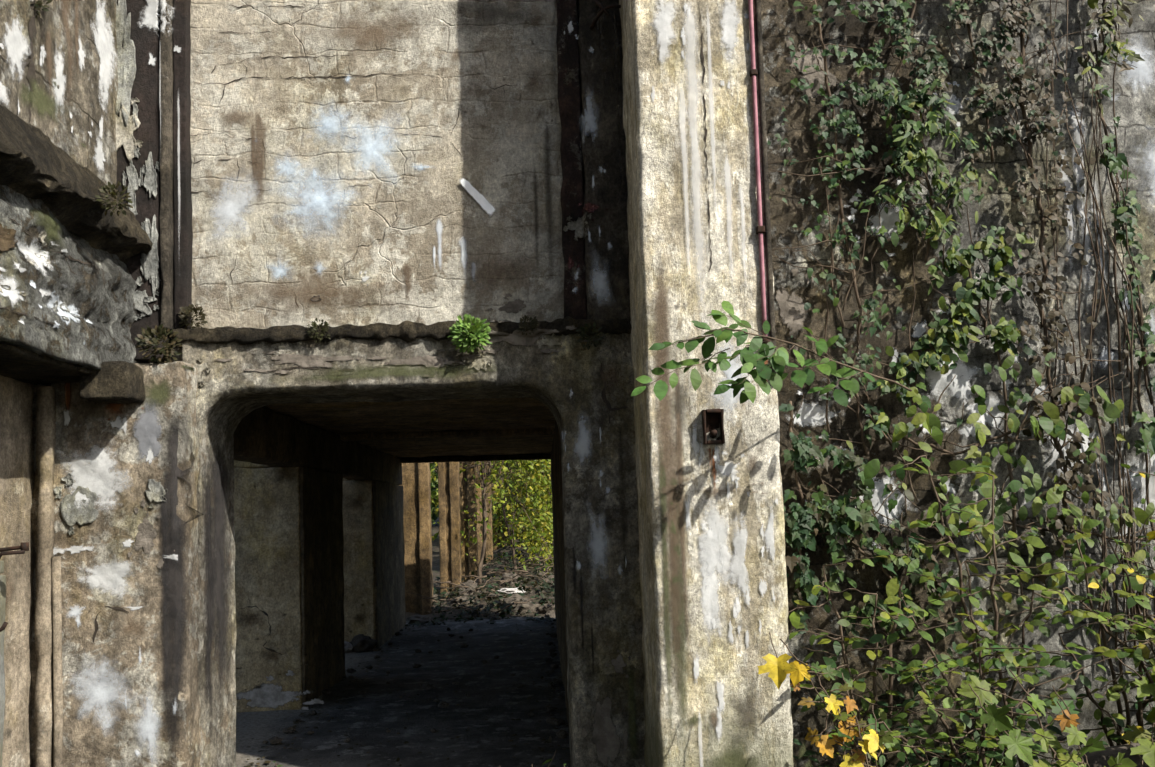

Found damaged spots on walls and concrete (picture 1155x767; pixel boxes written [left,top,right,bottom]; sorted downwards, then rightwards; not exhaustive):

peeling [0,20,73,133]
peeling [78,0,166,321]
water stain [225,111,265,194]
crack [191,5,429,193]
crack [328,112,462,164]
peeling [1125,48,1152,84]
peeling [0,223,92,328]
peeling [53,446,128,554]
peeling [80,479,178,633]
corrosion [709,447,719,486]
peeling [685,429,778,648]
peeling [136,703,157,756]